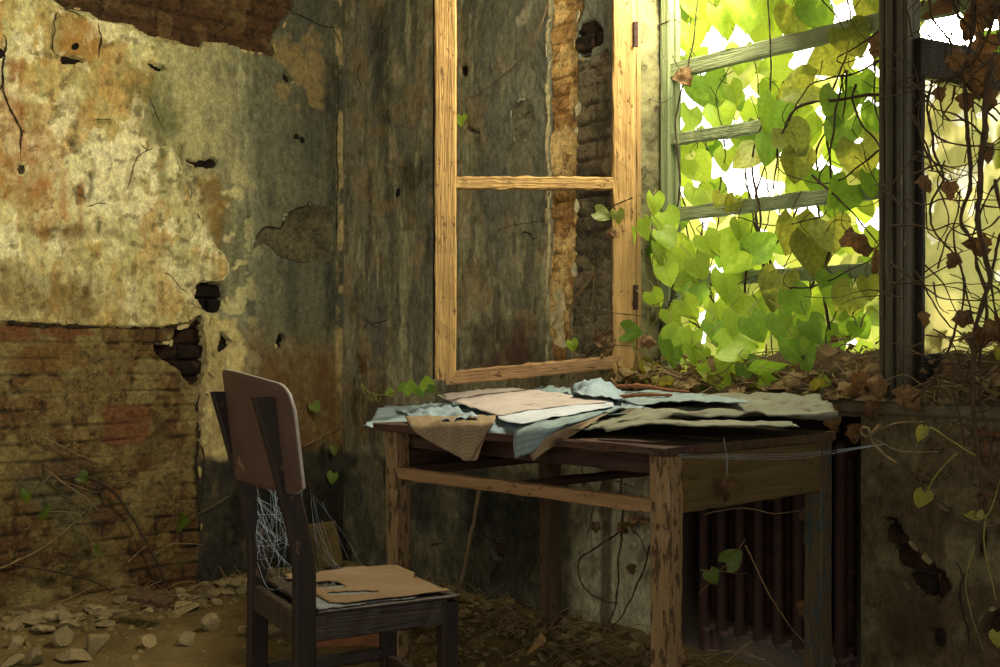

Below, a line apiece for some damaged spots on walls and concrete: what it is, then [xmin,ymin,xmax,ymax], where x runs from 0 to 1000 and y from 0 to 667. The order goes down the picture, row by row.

crack [52,8,104,58]
spalling [54,0,293,57]
crack [0,34,25,155]
spalling [544,0,612,177]
crack [128,98,166,186]
spalling [163,146,216,195]
spalling [542,190,612,361]
spalling [0,213,232,609]
spalling [885,517,952,597]